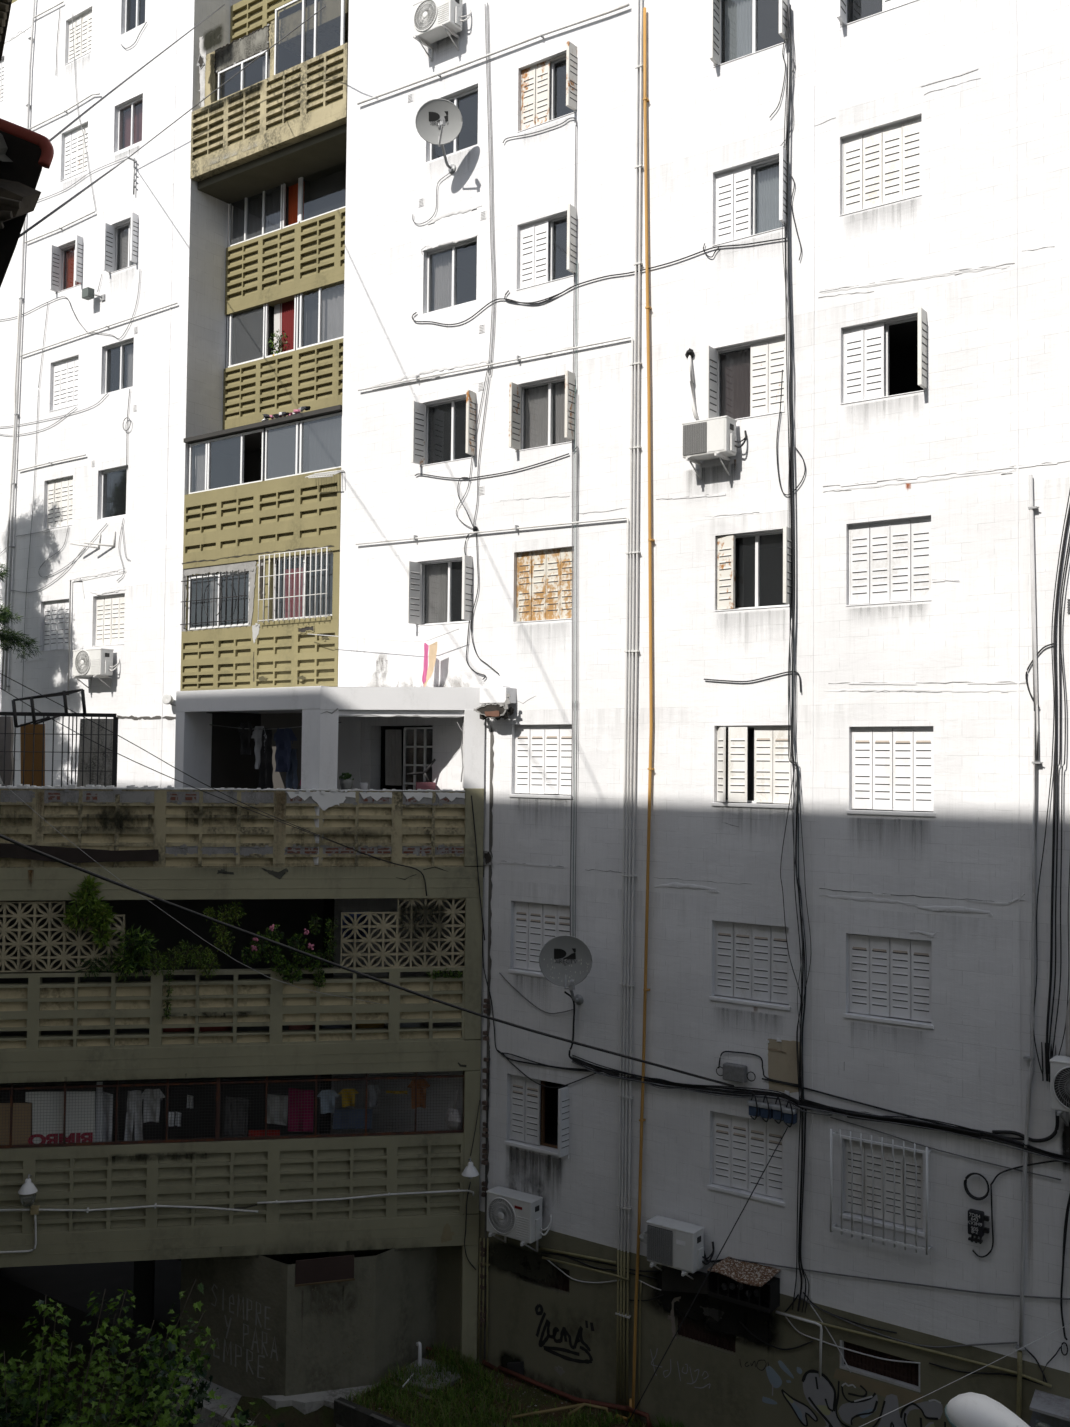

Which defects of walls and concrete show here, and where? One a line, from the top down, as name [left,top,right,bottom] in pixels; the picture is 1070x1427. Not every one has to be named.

crack [818,246,1055,298]
crack [823,461,1068,493]
spalling [241,790,465,806]
crack [819,888,1025,905]
water stain [509,1147,561,1209]